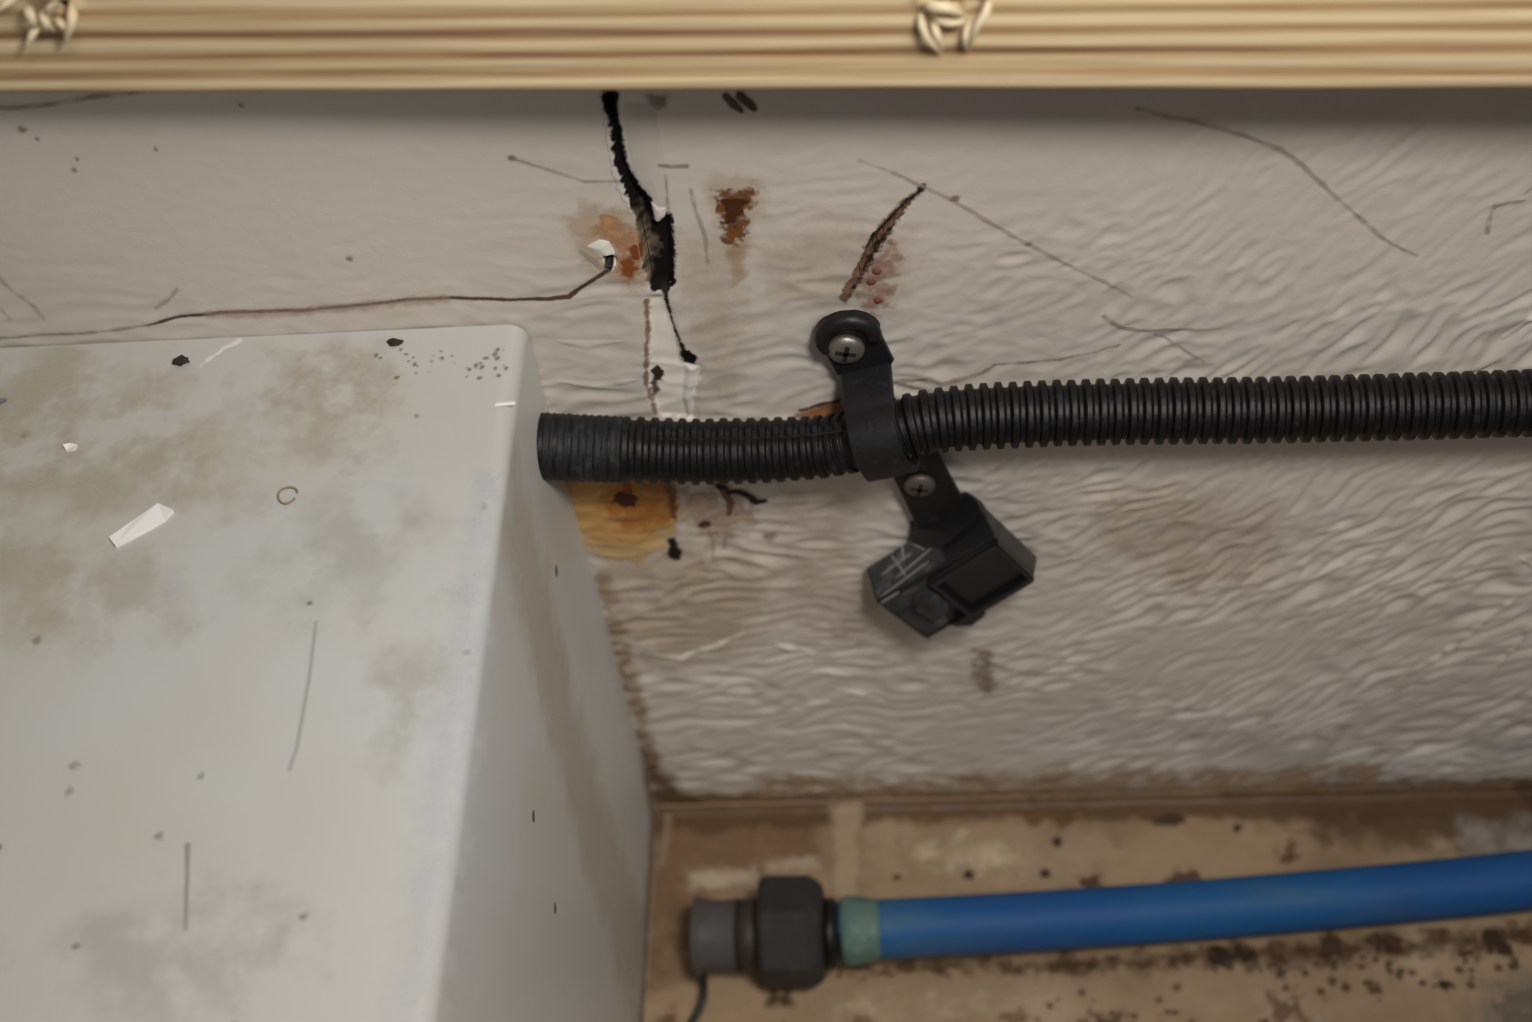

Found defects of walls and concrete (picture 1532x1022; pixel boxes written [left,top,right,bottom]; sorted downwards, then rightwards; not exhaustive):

crack [0,90,708,414]
corrosion [571,211,646,284]
corrosion [715,188,755,247]
crack [843,172,1191,354]
spalling [667,538,682,560]
damp [608,556,1532,978]
damp [1267,993,1306,1022]